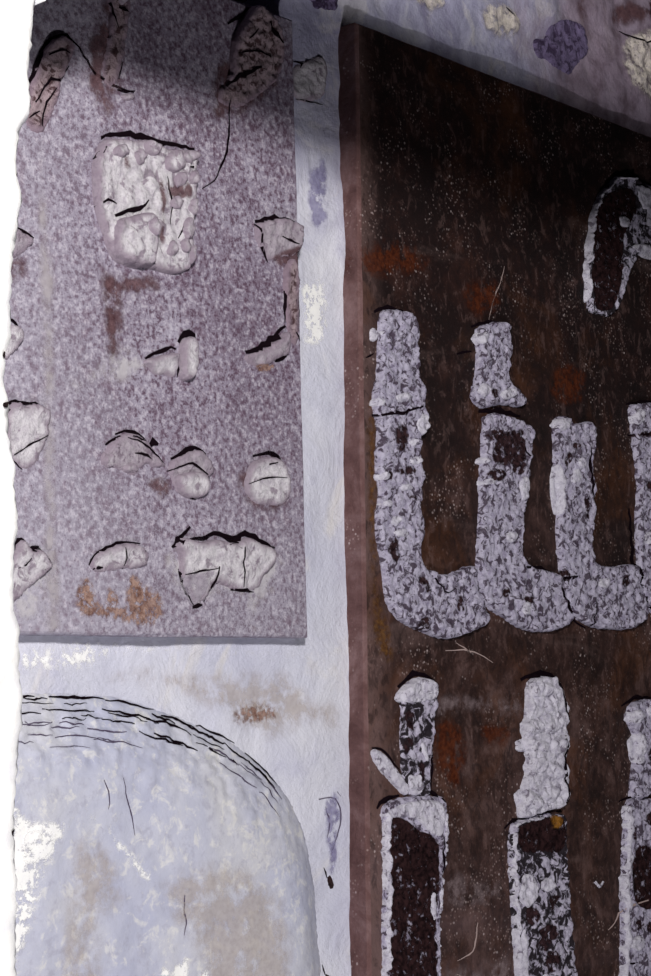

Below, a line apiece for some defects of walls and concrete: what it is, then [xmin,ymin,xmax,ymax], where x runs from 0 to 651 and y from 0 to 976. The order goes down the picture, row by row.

spalling [26,0,135,133]
crack [202,100,231,189]
spalling [91,130,201,275]
spalling [592,185,651,311]
spalling [243,450,291,506]
spalling [475,429,530,501]
peeling [550,443,587,515]
corrosion [77,577,162,625]
spalling [171,526,277,609]
crack [19,695,282,814]
crack [104,778,135,834]
spalling [380,677,446,976]